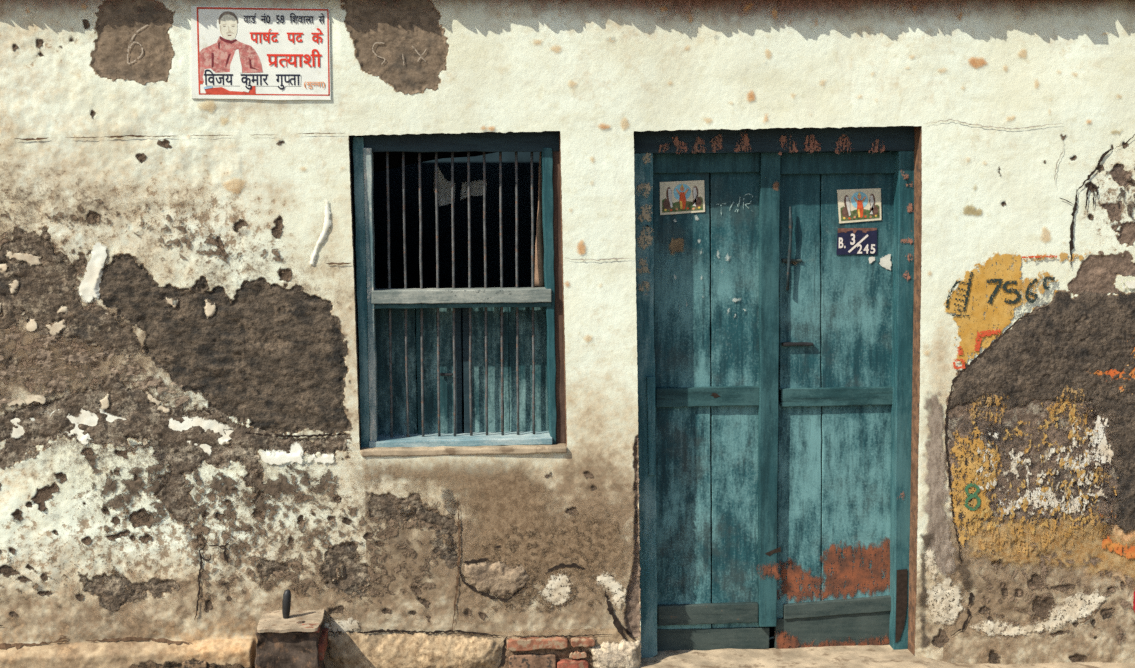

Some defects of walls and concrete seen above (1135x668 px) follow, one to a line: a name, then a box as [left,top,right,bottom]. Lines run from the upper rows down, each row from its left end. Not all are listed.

crack [926,119,1135,267]
flaking render [0,197,461,622]
flaking render [944,164,1135,534]
damp [363,462,623,591]
flaking render [931,629,963,648]
flaking render [976,543,1135,664]